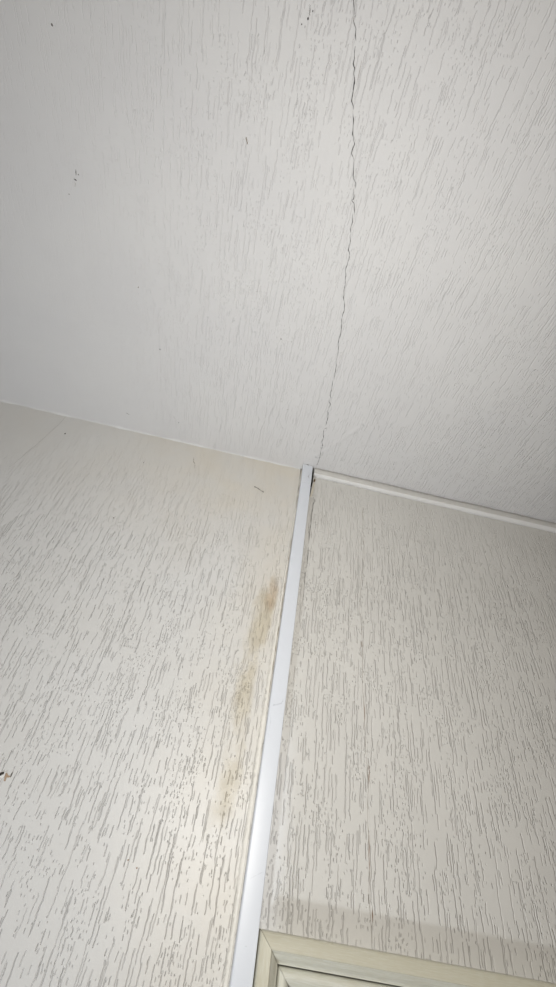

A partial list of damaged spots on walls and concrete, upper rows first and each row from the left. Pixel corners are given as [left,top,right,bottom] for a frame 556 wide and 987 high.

crack [267,0,362,705]